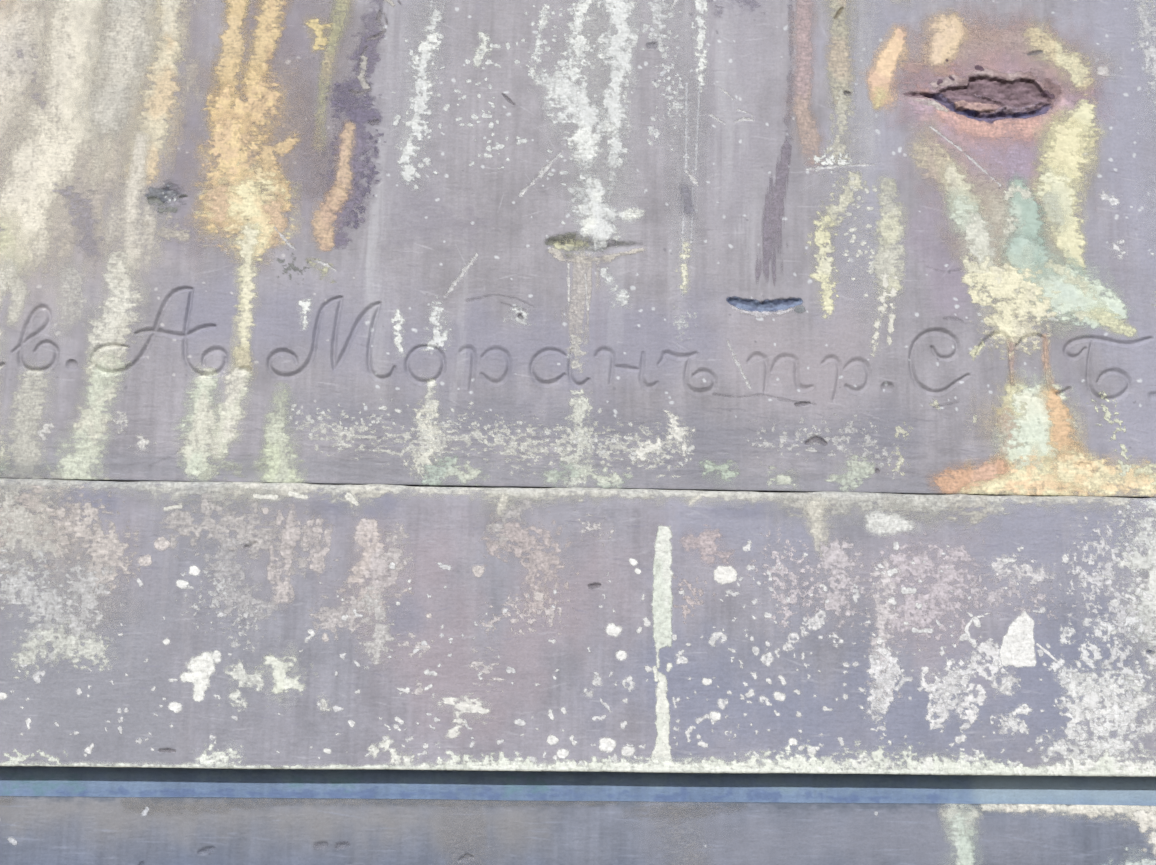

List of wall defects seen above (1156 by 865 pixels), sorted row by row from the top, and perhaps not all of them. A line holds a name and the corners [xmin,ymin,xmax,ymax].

corrosion [194,0,356,460]
spalling [727,296,805,318]
corrosion [793,0,906,357]
spalling [904,65,1061,123]
corrosion [867,13,1102,275]
corrosion [934,335,1156,498]